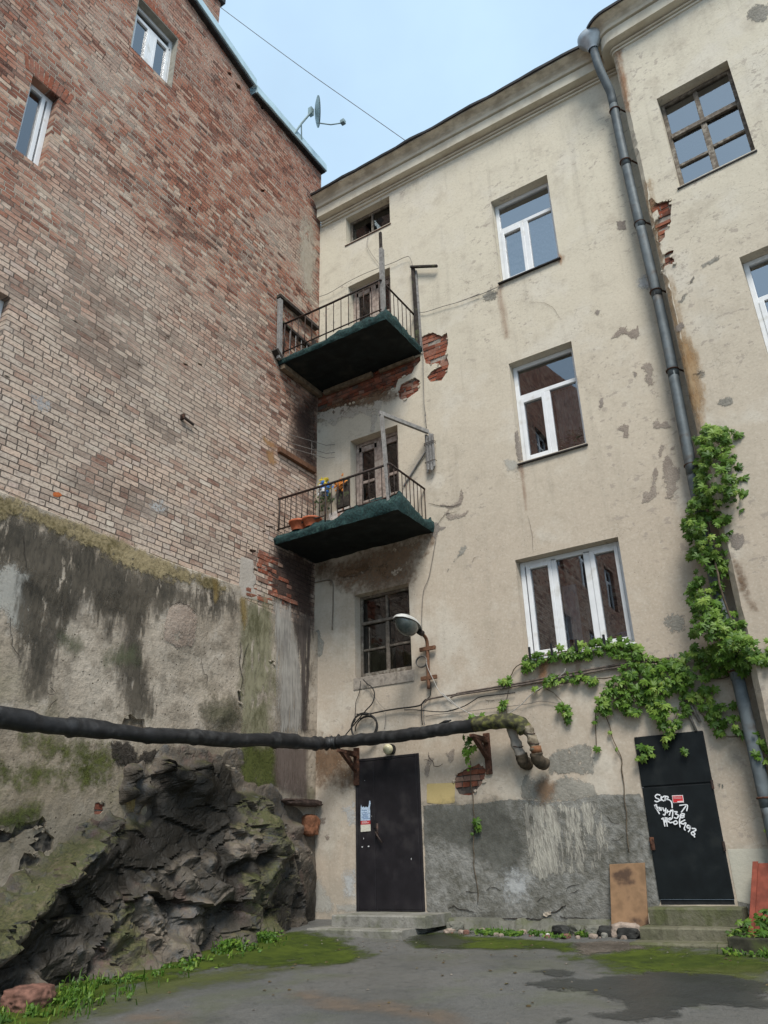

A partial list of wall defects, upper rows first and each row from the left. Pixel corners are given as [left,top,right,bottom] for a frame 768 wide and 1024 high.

flaking render [650,198,677,275]
flaking render [317,331,449,432]
peeling [611,326,640,339]
rust [666,283,702,421]
peeling [641,444,680,503]
water stain [0,513,236,719]
spalling [246,550,298,605]
flaking render [447,749,486,795]